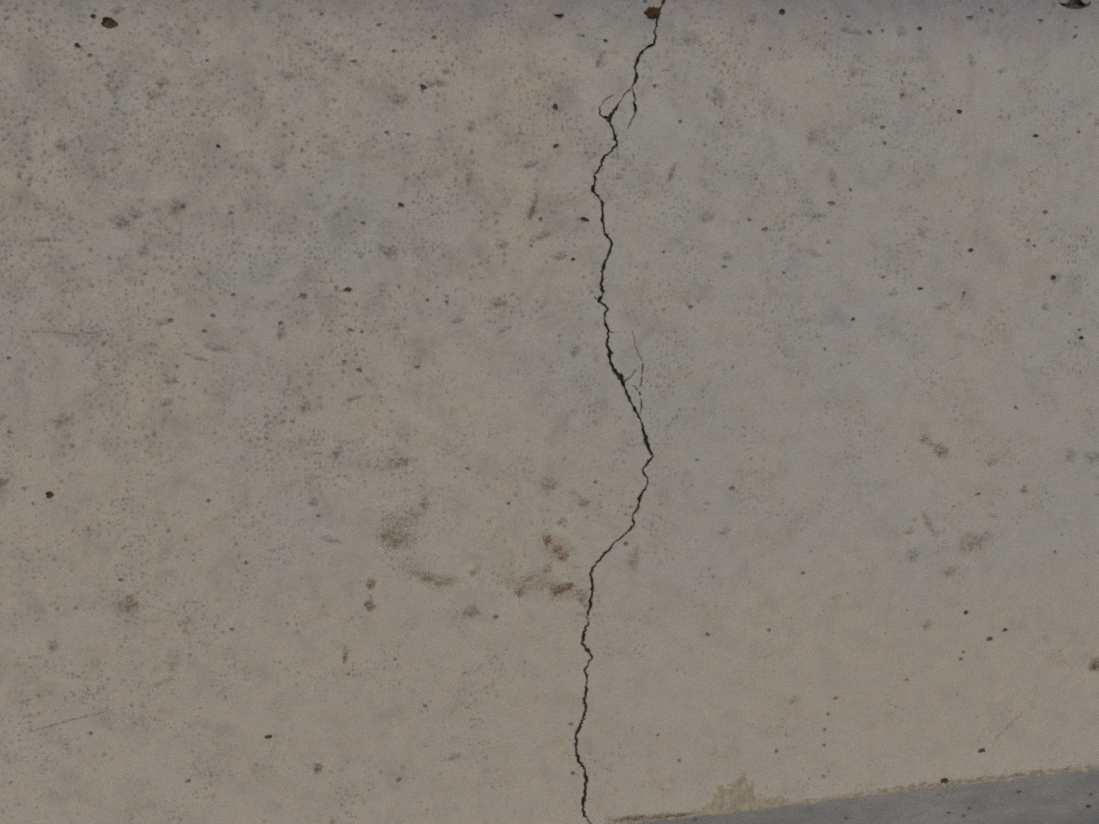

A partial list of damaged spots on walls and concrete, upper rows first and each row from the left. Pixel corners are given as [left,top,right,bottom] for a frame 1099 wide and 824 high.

crack [574,0,666,824]